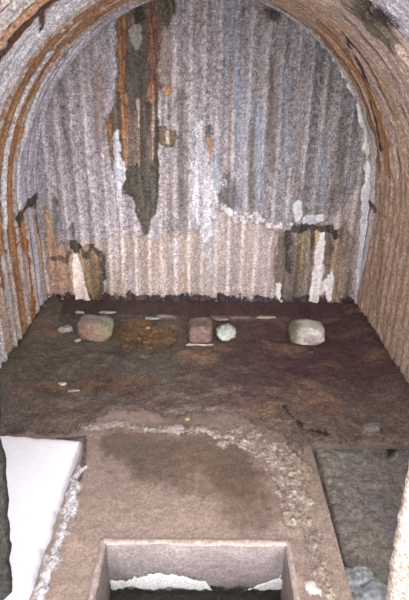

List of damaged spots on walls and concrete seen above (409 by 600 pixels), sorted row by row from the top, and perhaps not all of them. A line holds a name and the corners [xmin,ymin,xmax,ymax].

peeling [1,243,13,309]
peeling [15,193,107,315]
corrosion [0,0,129,332]
spalling [105,0,177,235]
peeling [216,43,409,382]
corrosion [314,21,391,183]